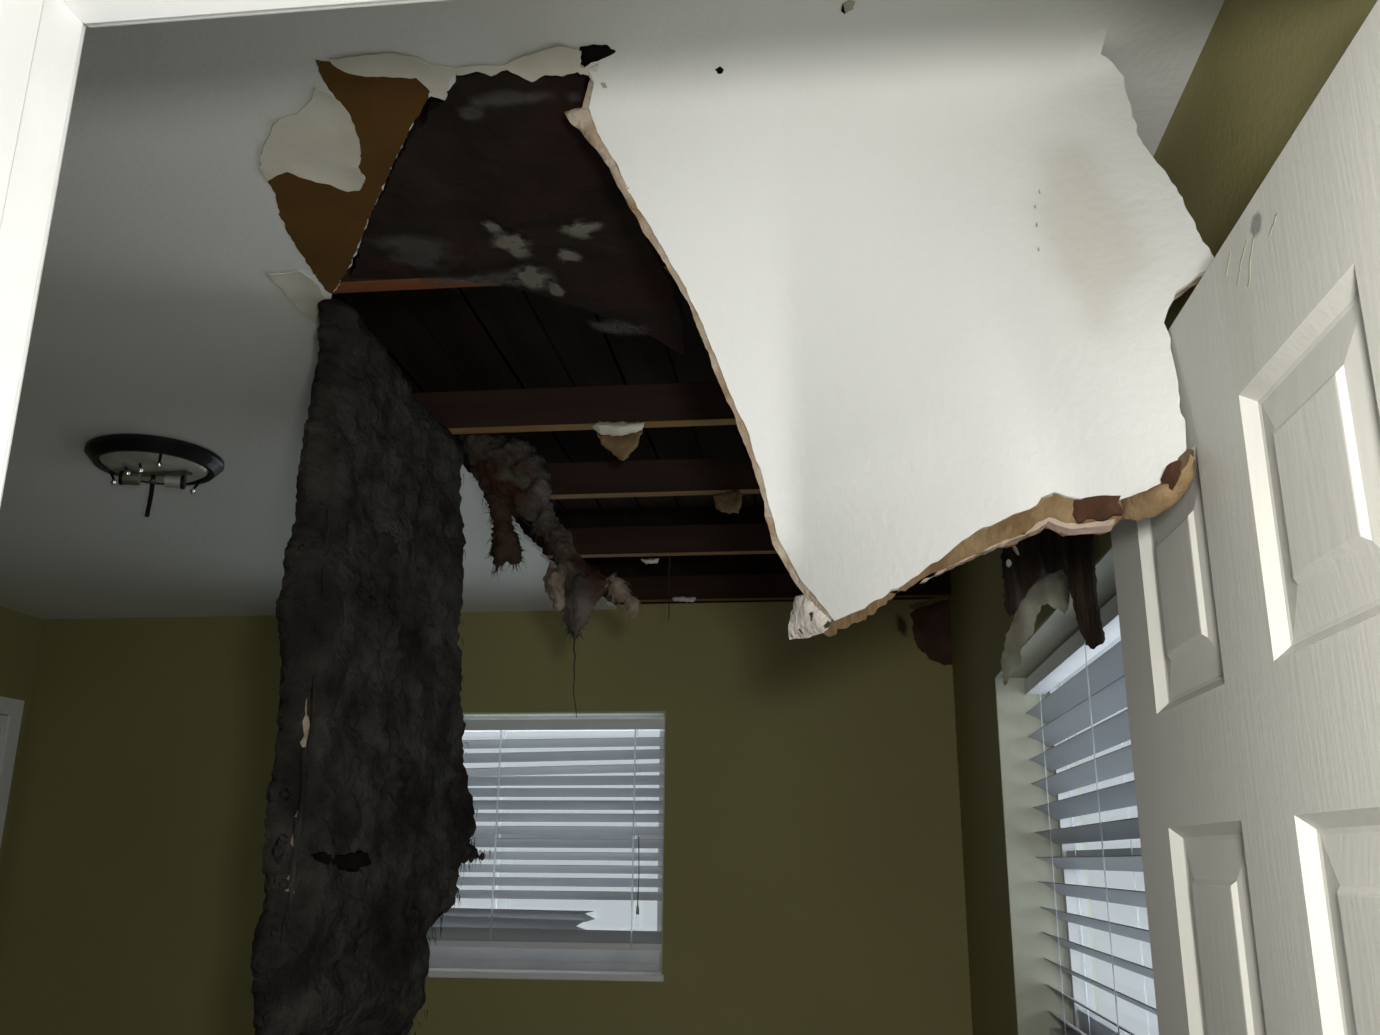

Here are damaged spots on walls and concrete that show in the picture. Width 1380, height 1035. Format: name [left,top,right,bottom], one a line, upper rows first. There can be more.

mould [462,91,544,119]
mould [380,223,564,296]
mould [559,223,601,261]
spalling [788,595,831,640]
peeling [910,599,952,666]